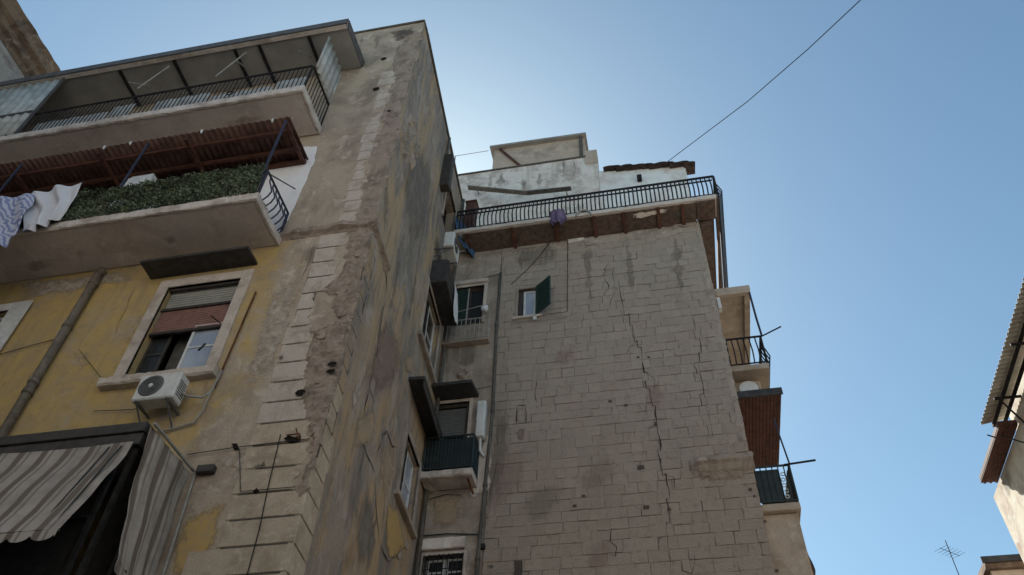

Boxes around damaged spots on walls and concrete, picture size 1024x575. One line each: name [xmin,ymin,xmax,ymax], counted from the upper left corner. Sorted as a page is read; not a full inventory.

spalling [283,33,423,497]
crack [603,263,695,574]